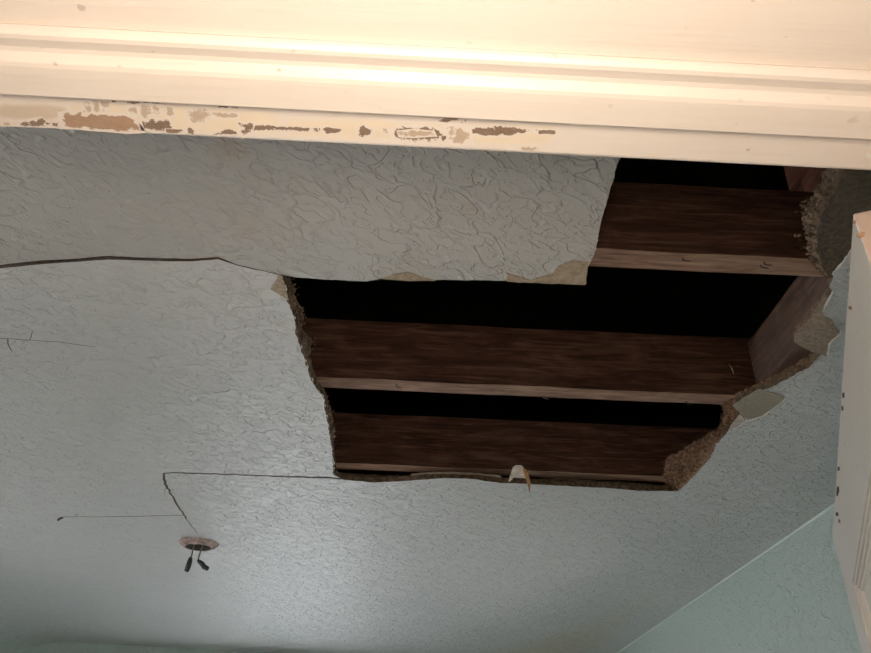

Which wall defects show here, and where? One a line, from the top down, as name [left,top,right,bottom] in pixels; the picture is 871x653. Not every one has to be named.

peeling [0,98,562,152]
crack [0,257,280,275]
peeling [382,272,436,281]
peeling [507,261,589,285]
crack [0,331,94,351]
peeling [729,389,785,430]
crack [57,472,342,534]